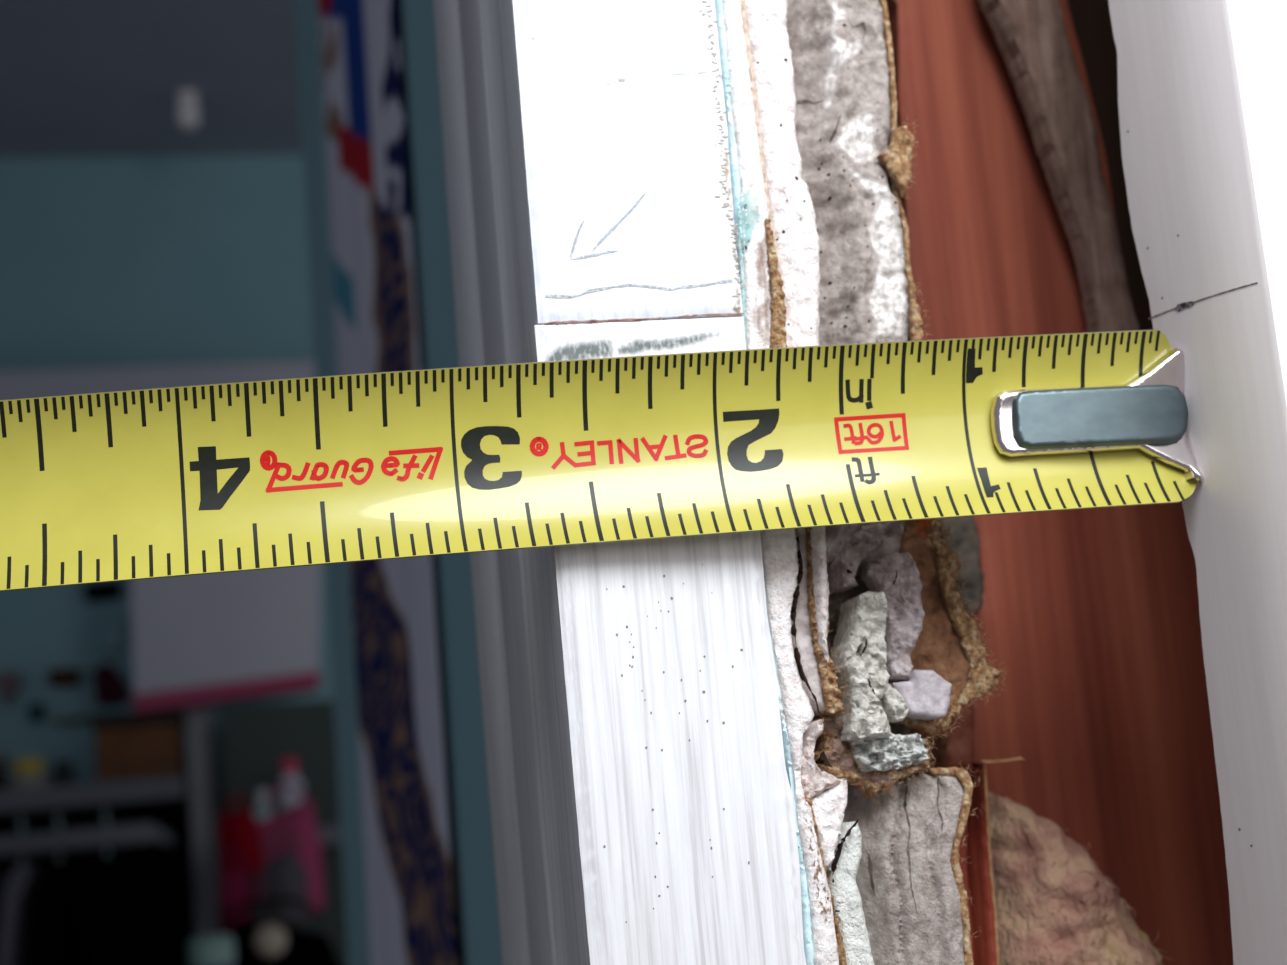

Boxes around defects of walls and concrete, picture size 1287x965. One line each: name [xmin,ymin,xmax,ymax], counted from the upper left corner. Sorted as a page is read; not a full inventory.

peeling [806,819,840,921]
crack [831,819,875,895]
crack [903,777,943,913]